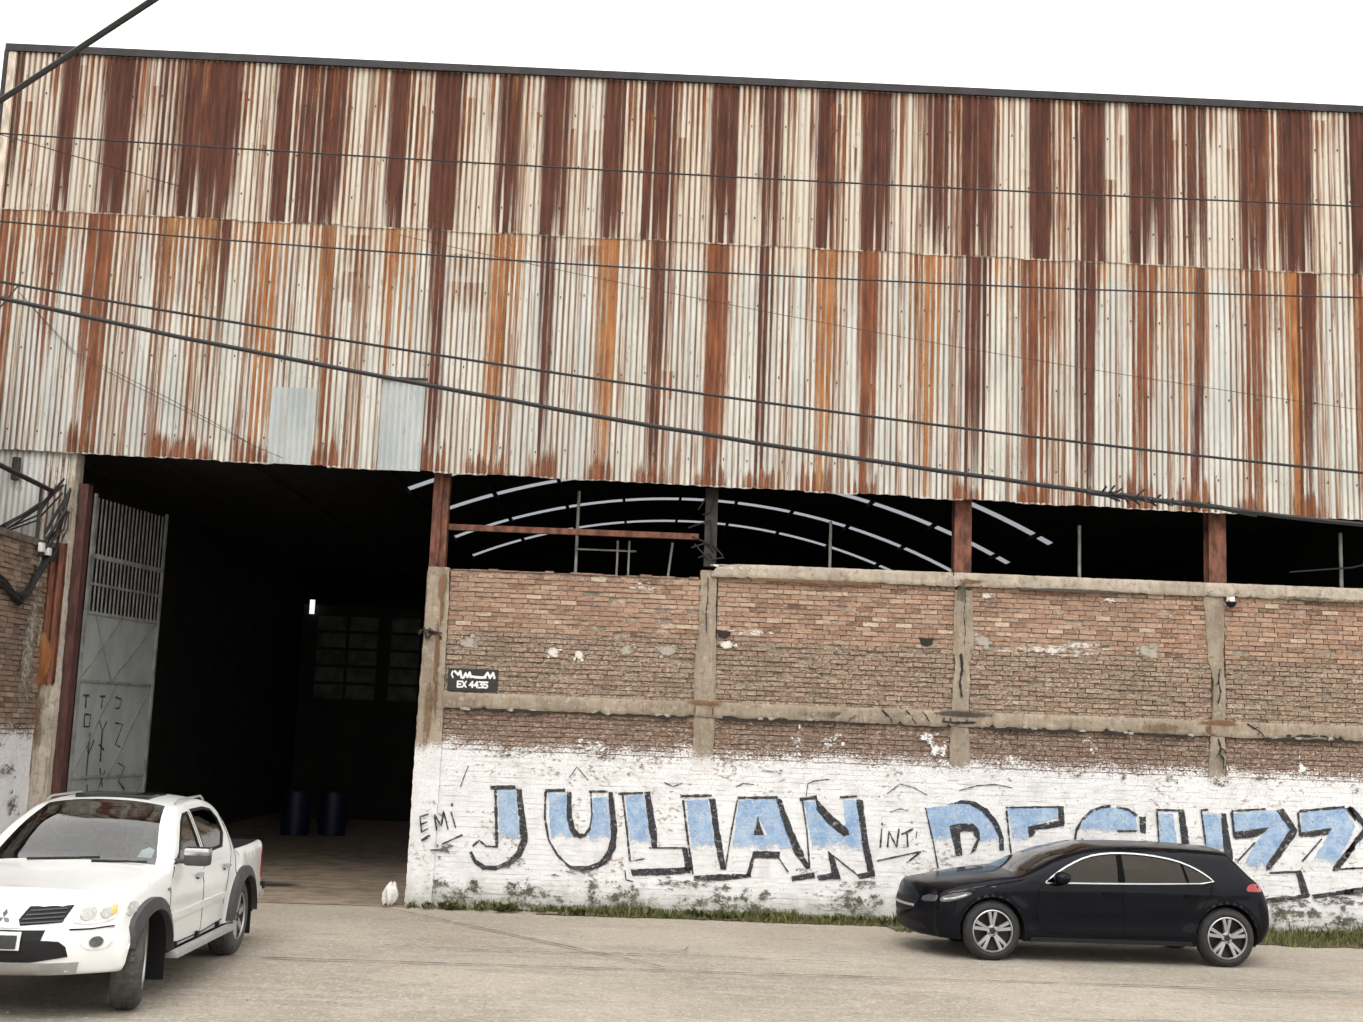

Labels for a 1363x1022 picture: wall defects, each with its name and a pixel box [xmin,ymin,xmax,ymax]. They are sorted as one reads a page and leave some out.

rust [0,52,574,542]
rust [588,80,796,489]
rust [796,90,904,494]
rust [909,94,1217,512]
rust [1228,109,1363,518]
spalling [721,716,865,747]
spalling [985,725,1194,754]
spalling [1265,736,1361,771]